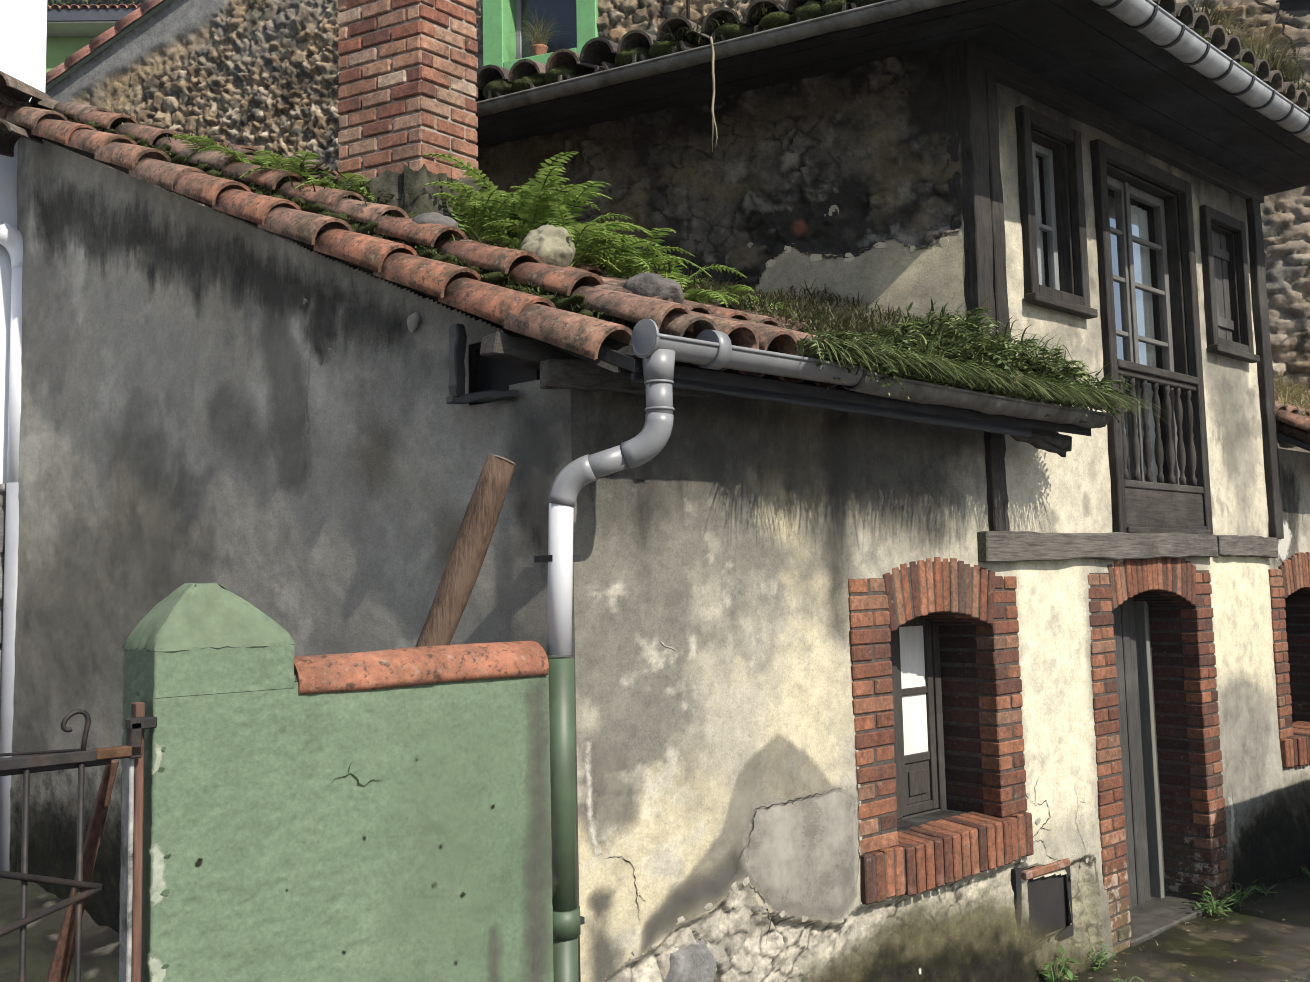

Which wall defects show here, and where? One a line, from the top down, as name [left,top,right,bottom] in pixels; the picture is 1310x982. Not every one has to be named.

spalling [476,49,963,292]
leakage [34,187,402,484]
crack [332,762,379,787]
crack [608,856,645,920]
spalling [603,854,1107,982]
leakage [864,934,1046,982]
leakage [1228,797,1310,899]